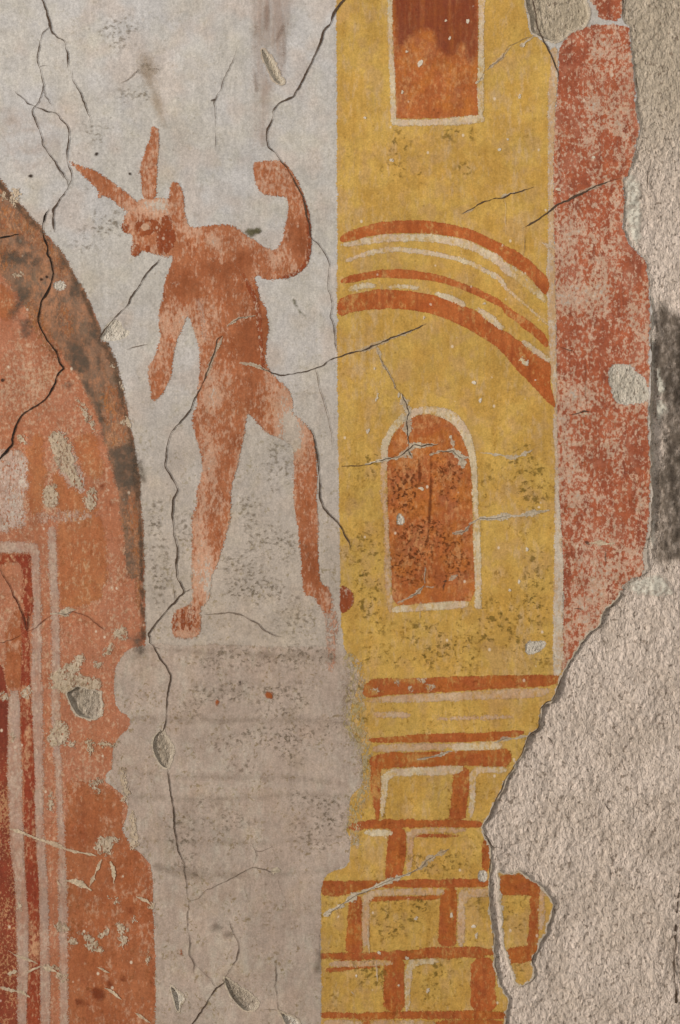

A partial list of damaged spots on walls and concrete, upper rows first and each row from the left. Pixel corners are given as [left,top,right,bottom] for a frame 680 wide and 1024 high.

crack [0,0,92,459]
crack [239,0,532,545]
crack [462,159,663,250]
water stain [625,176,642,243]
water stain [650,299,680,560]
crack [148,315,255,731]
flaking render [478,0,680,1024]
water stain [627,576,672,596]
peeling [46,625,128,756]
peeling [52,915,138,952]
flaking render [222,976,260,1012]
crack [323,849,448,917]